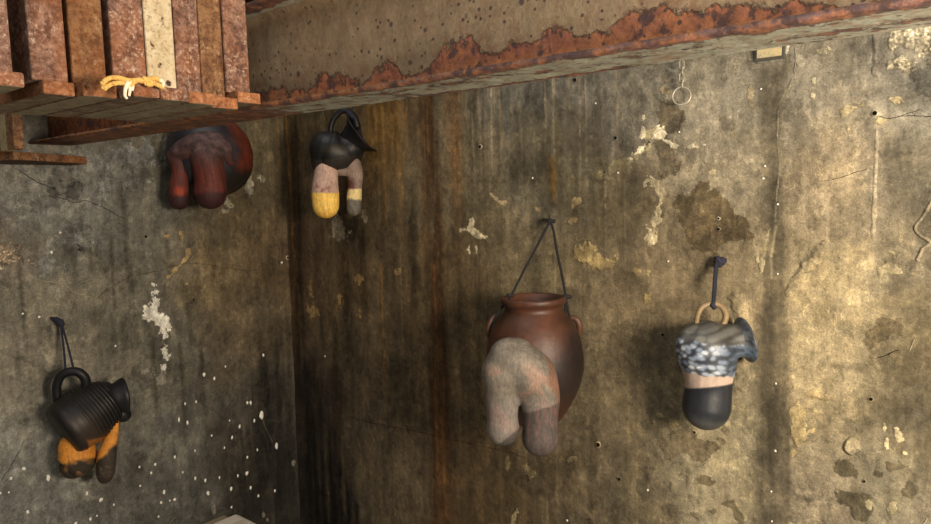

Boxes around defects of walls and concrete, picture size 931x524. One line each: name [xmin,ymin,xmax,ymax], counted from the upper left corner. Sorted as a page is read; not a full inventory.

spalling [883,26,931,97]
flaking render [840,102,887,131]
flaking render [0,134,169,281]
flaking render [459,217,488,254]
flaking render [572,241,619,272]
leakage [225,114,359,524]